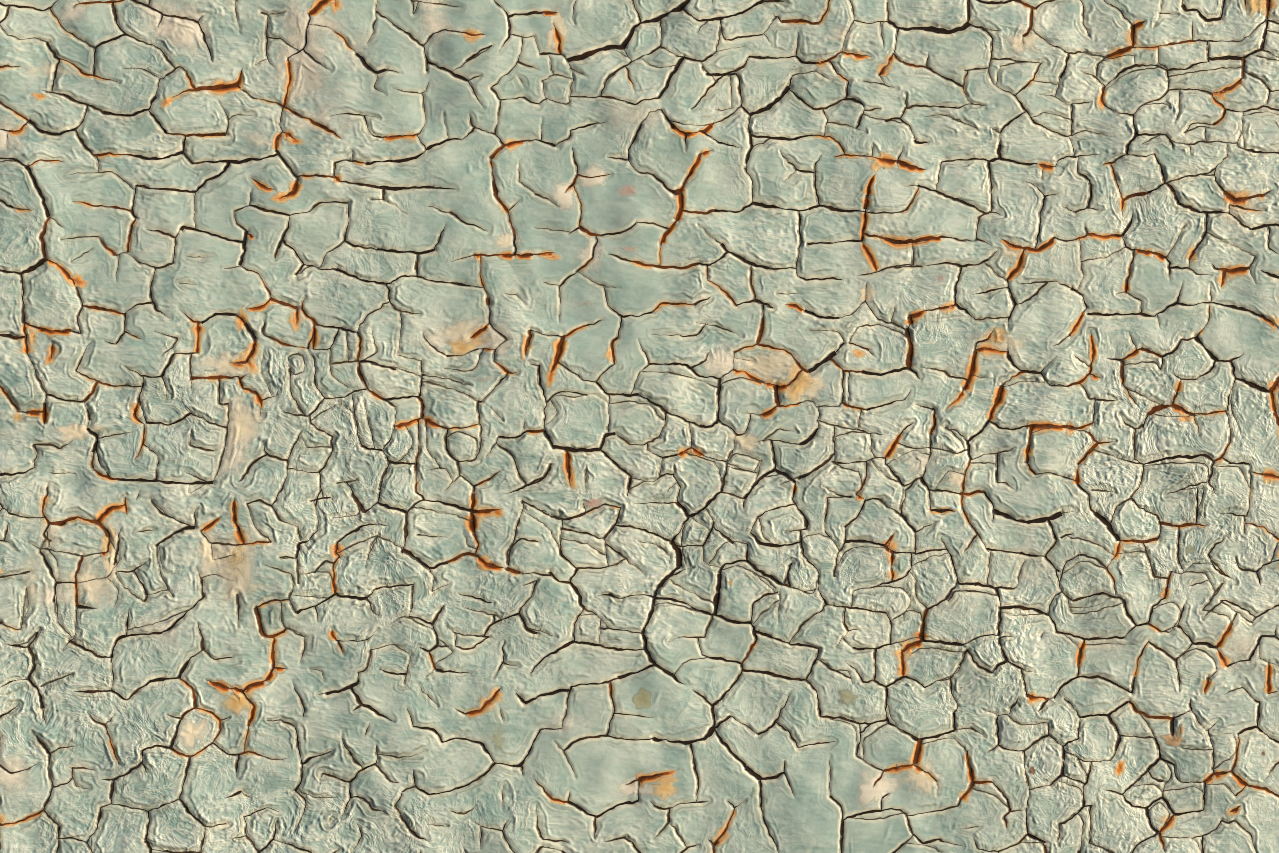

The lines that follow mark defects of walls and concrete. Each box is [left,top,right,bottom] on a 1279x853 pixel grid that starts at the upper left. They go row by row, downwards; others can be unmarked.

corrosion [208,72,243,95]
corrosion [659,123,714,244]
corrosion [859,153,942,272]
crack [0,0,831,853]
corrosion [546,339,568,387]
crack [394,0,1279,853]
corrosion [948,328,1007,409]
corrosion [986,387,1008,421]
corrosion [464,496,504,533]
corrosion [208,638,285,725]
corrosion [637,770,677,800]
corrosion [887,742,924,774]